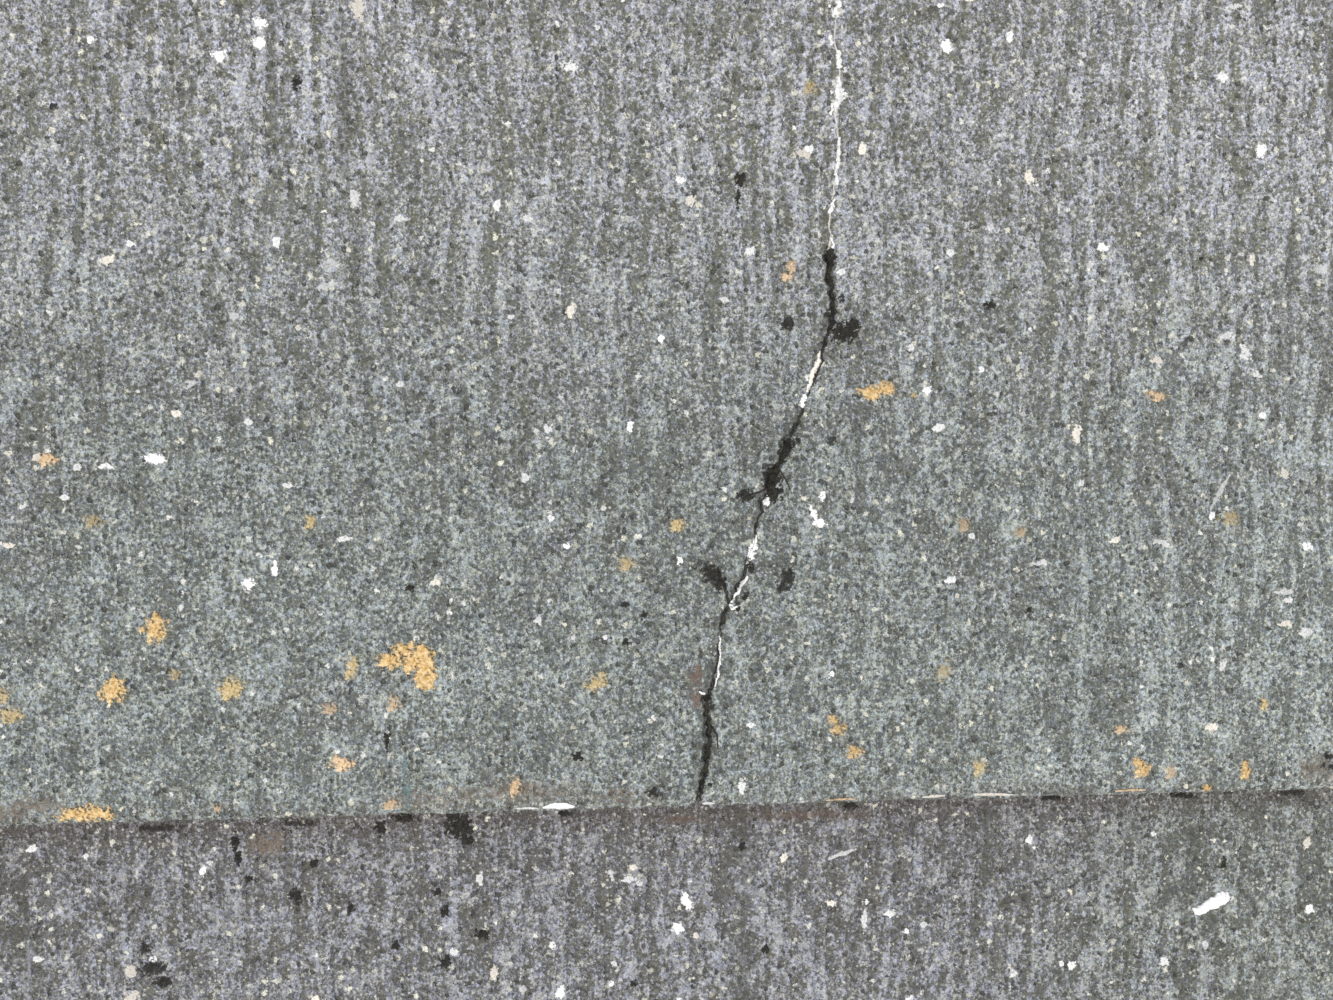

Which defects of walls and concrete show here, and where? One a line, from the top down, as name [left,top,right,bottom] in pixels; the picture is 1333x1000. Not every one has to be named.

crack [695,0,865,801]